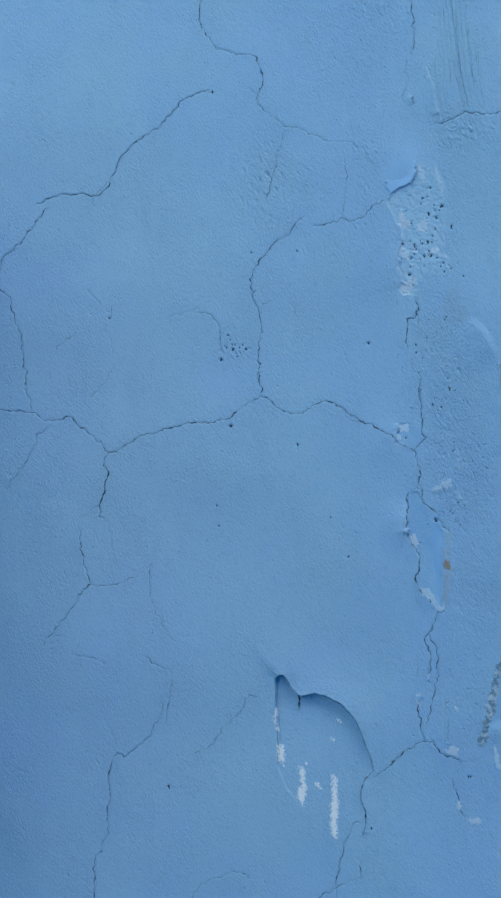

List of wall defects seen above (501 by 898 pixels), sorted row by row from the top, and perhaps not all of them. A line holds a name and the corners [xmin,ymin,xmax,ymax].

crack [0,89,209,264]
crack [198,3,373,198]
crack [401,0,501,126]
crack [0,162,467,817]
peeling [404,477,469,615]
crack [92,656,173,898]
crack [319,822,362,898]
spalling [476,660,501,788]